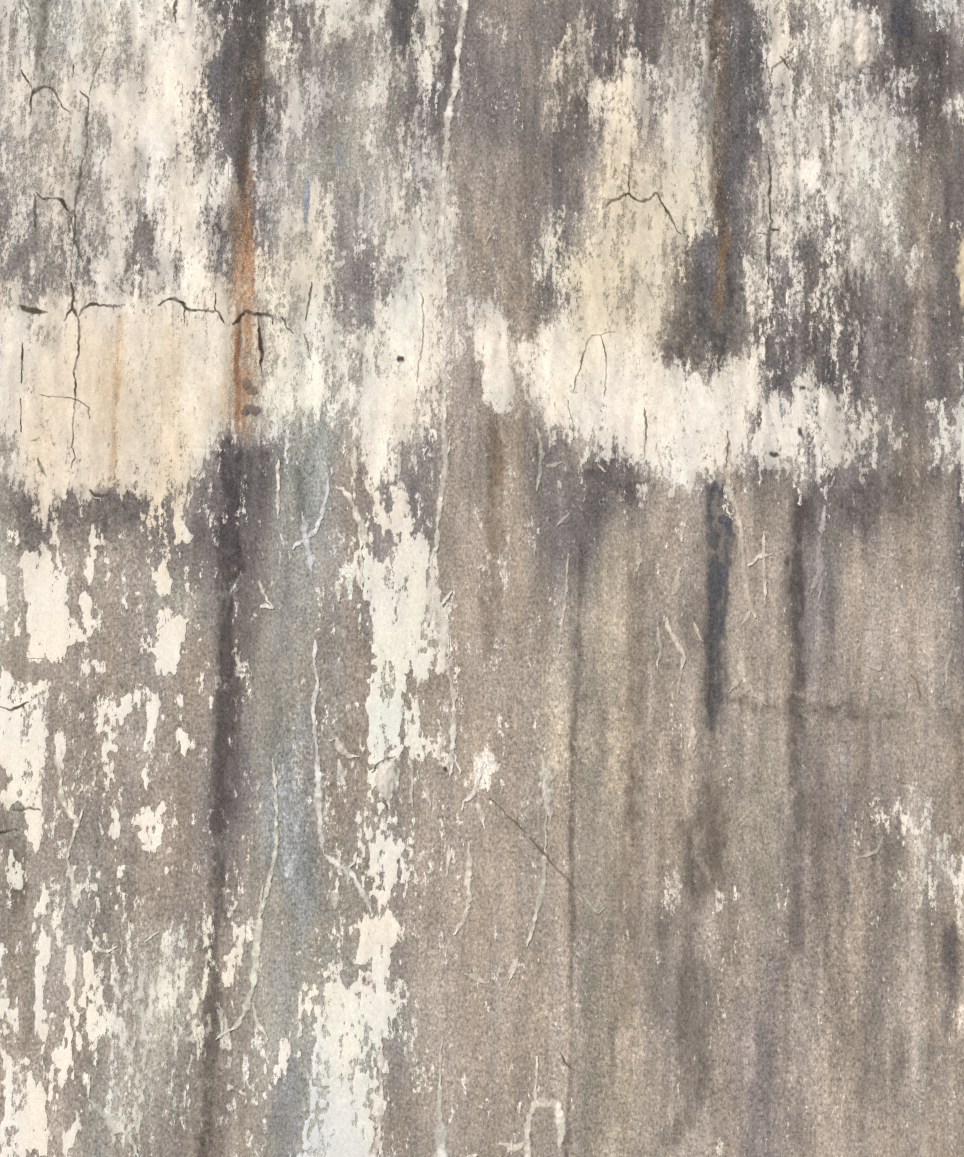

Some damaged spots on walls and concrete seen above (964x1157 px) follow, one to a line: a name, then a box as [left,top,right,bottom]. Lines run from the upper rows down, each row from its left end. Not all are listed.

crack [606,168,681,234]
crack [20,47,125,465]
crack [158,282,312,371]
corrosion [234,179,254,424]
peeling [848,320,860,371]
peeling [84,525,110,585]
peeling [0,572,10,635]
peeling [80,658,103,682]
peeling [140,606,189,676]
water stain [210,439,244,947]
water stain [705,481,733,721]
peeling [0,662,249,1157]